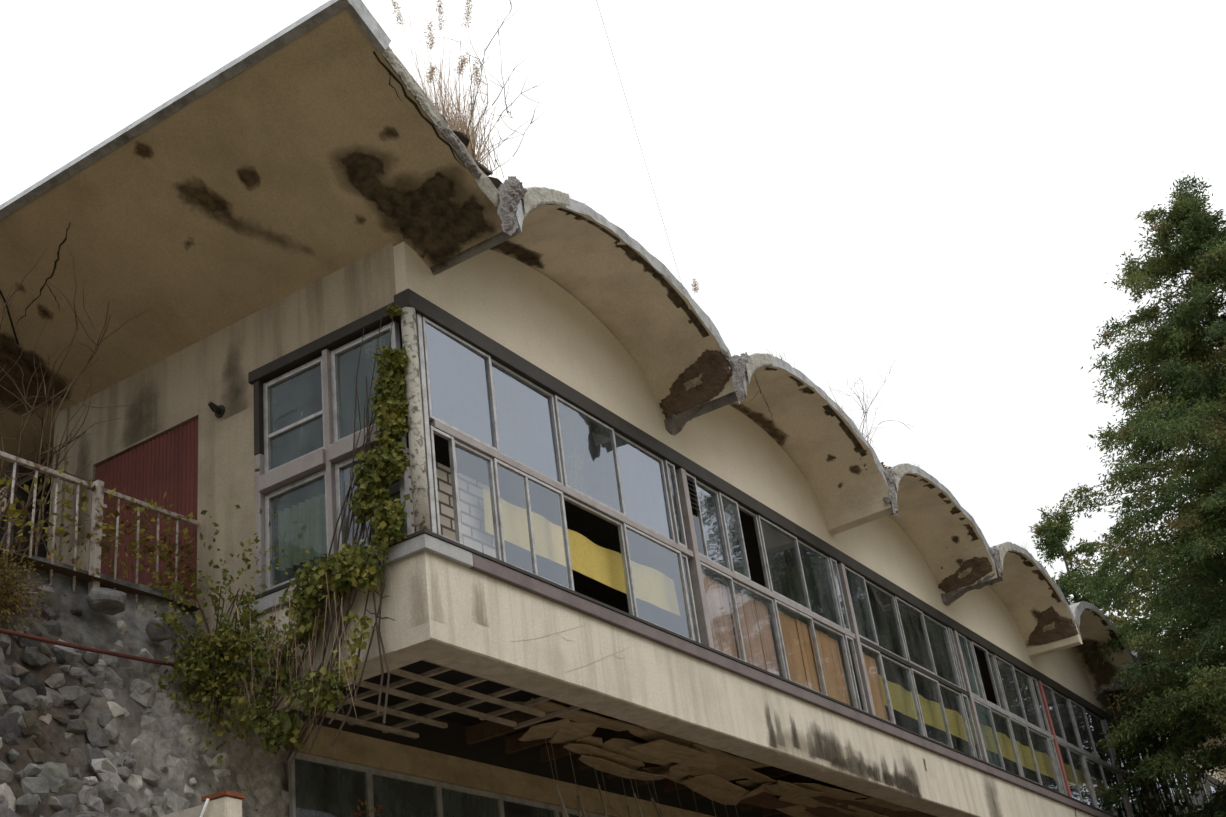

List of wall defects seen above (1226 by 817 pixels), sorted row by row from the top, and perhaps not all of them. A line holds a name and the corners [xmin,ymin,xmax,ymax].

water stain [136,143,151,157]
water stain [177,185,240,227]
water stain [237,169,259,188]
spalling [382,48,482,180]
crack [17,222,70,324]
peeling [340,152,815,419]
peeling [823,405,867,457]
spalling [883,463,1078,646]
peeling [1085,609,1159,682]
water stain [767,711,927,797]